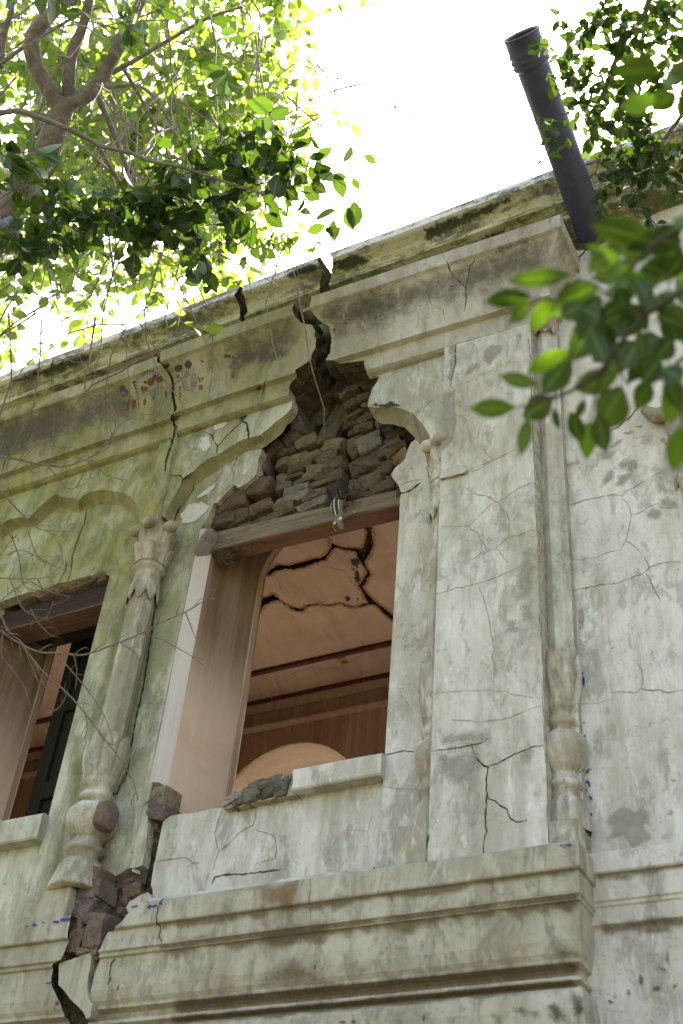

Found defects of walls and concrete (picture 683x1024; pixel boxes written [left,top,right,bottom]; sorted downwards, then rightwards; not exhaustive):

crack [158,359,250,521]
spalling [180,306,415,562]
crack [260,526,394,622]
crack [382,327,681,853]
crack [155,807,282,884]
spalling [221,774,300,813]